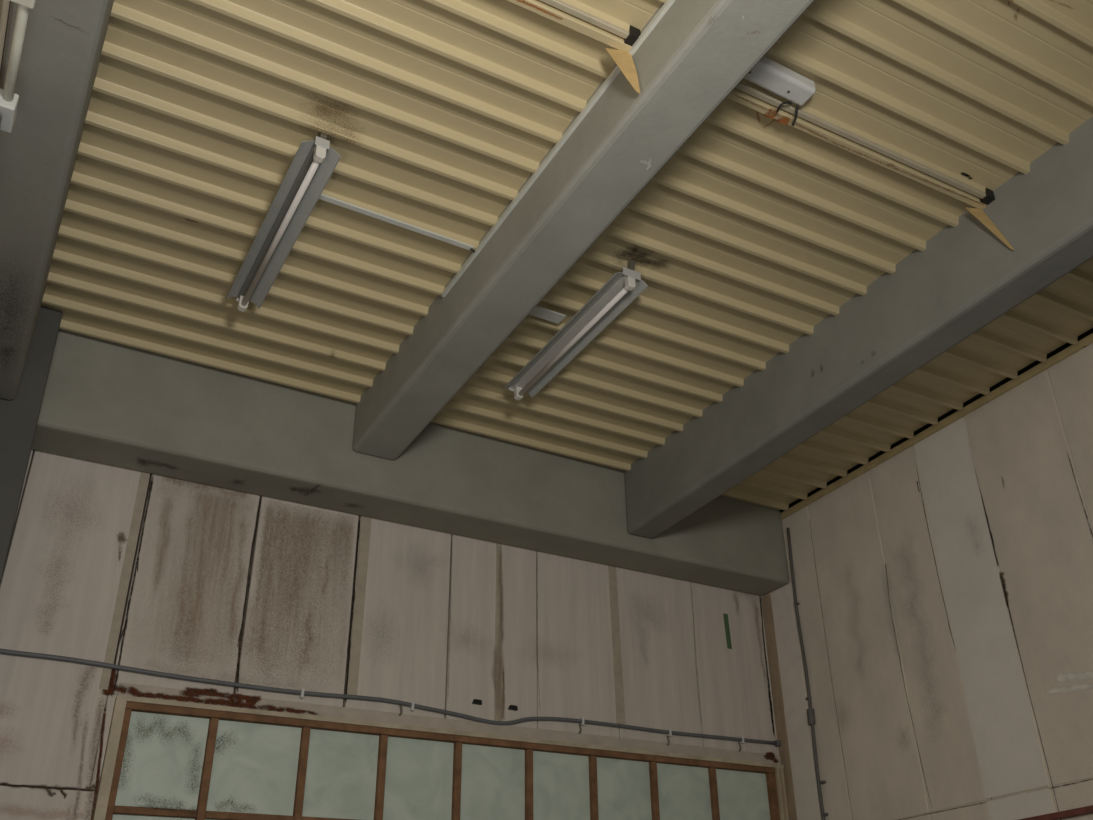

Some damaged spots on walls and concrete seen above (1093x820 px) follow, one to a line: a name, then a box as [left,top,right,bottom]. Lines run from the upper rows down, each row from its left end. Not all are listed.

water stain [124,457,361,700]
crack [1,782,98,799]
rust [90,669,321,820]